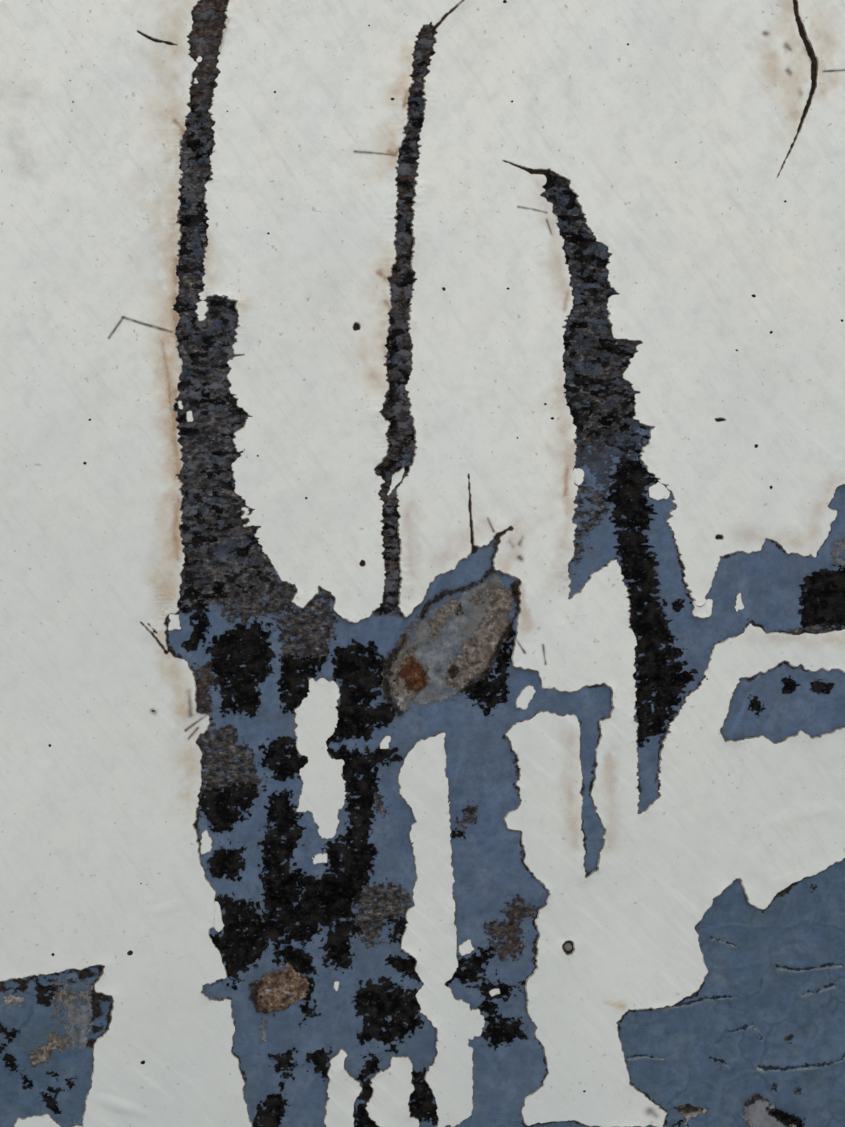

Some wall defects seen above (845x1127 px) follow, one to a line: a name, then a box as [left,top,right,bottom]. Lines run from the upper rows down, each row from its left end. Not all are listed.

crack [778,0,840,175]
peeling [165,0,613,1127]
peeling [540,171,845,813]
peeling [0,965,113,1127]
peeling [617,859,845,1127]